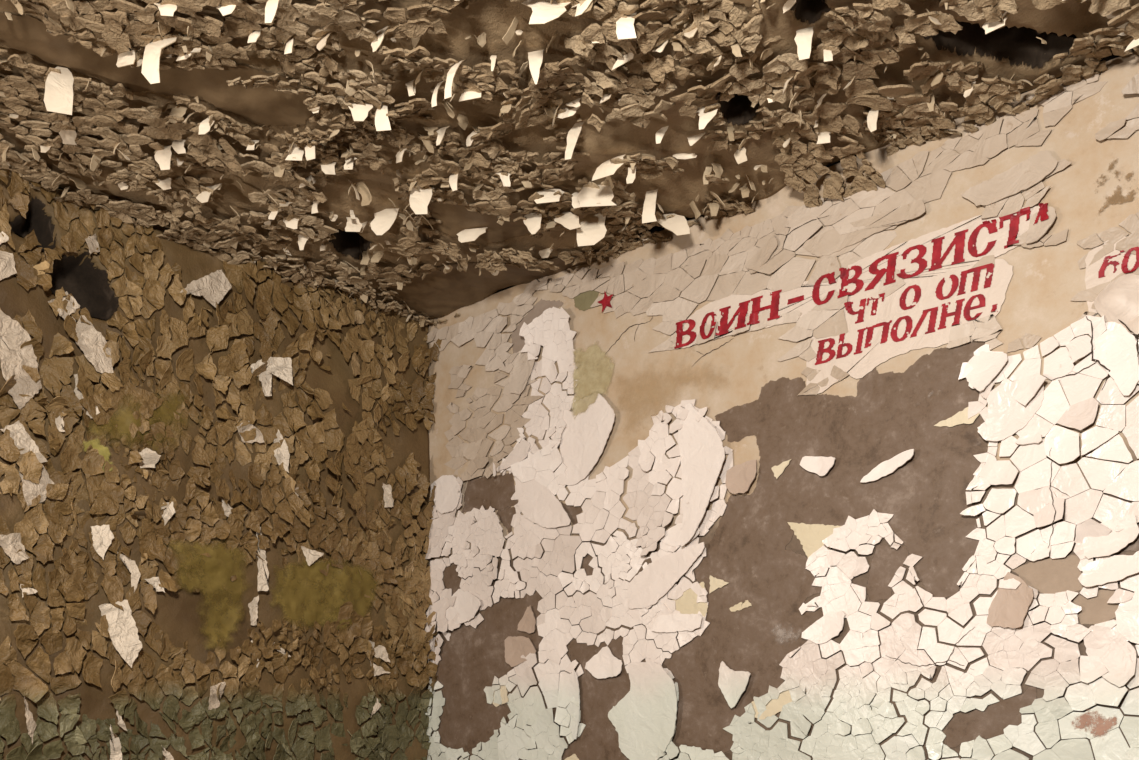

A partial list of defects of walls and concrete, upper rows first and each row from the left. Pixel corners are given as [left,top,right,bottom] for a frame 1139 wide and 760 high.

peeling [0,0,782,760]
spalling [325,0,1139,760]
crack [1046,316,1139,389]
crack [1048,452,1067,547]
crack [890,630,974,670]